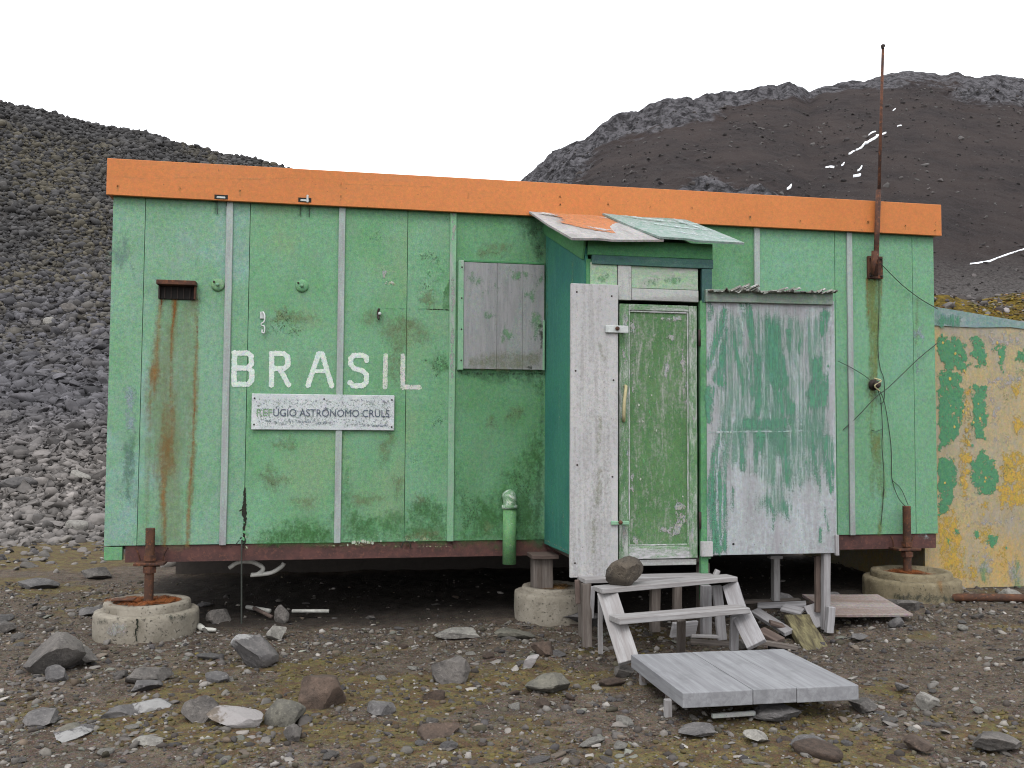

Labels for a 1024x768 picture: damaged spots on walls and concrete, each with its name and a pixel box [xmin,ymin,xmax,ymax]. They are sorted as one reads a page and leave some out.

peeling [538,212,725,239]
rust [151,299,177,391]
rust [867,280,880,378]
peeling [692,303,835,555]
crack [230,487,249,549]
peeling [660,496,693,543]
peeling [936,314,1024,672]
peeling [0,634,294,768]
peeling [263,622,616,727]
peeling [541,696,698,768]
peeling [700,725,771,768]
peeling [799,676,924,733]